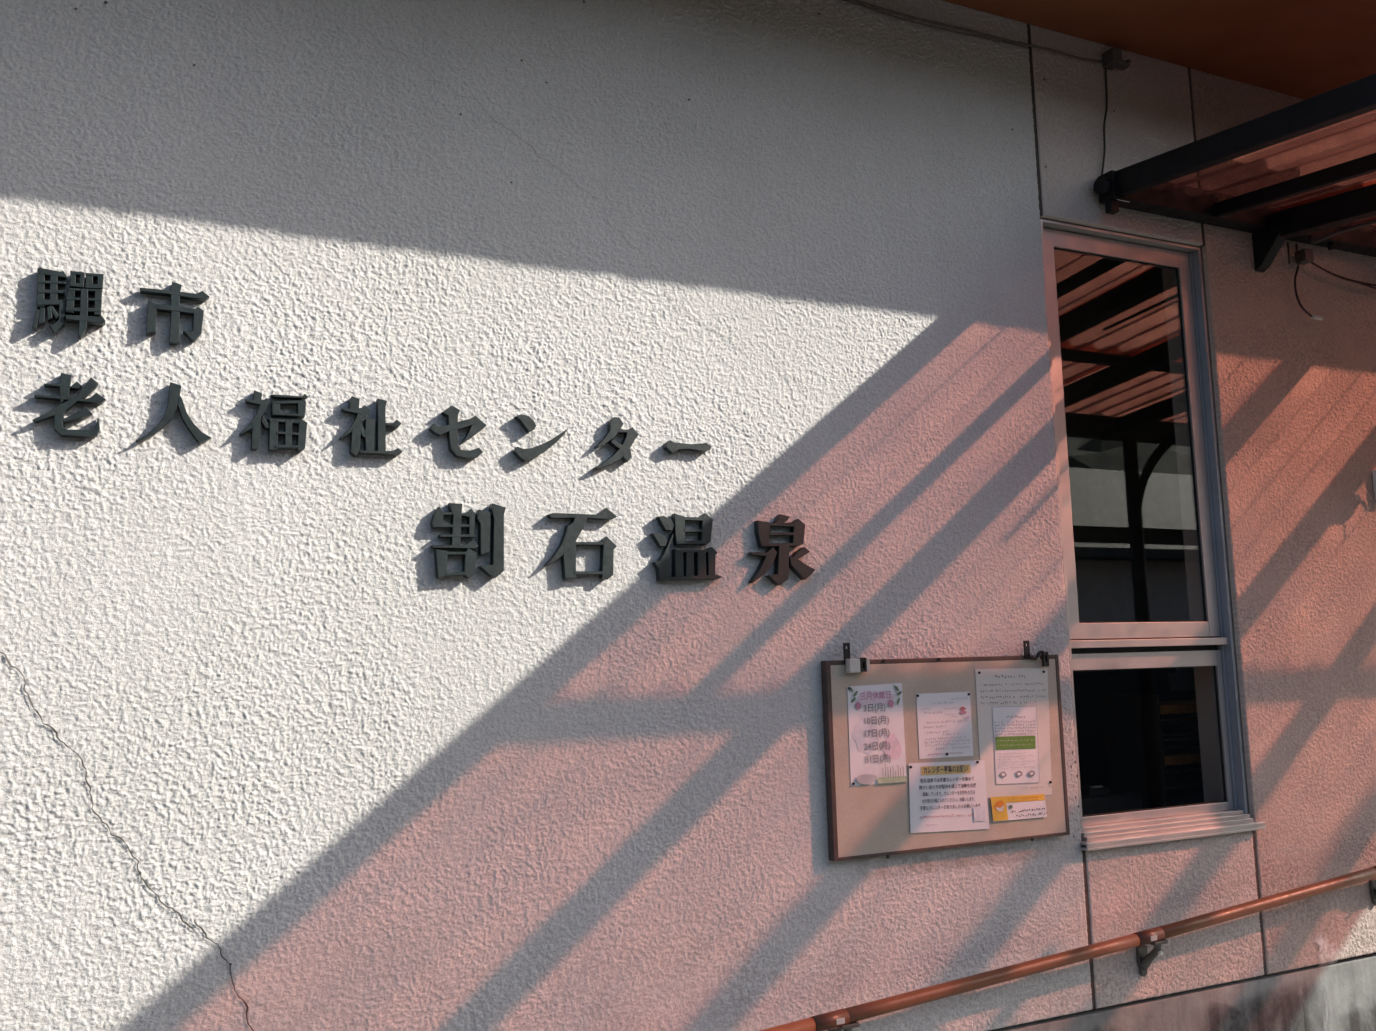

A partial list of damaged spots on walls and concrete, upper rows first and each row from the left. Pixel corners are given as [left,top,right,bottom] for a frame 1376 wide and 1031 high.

crack [0,652,254,1031]